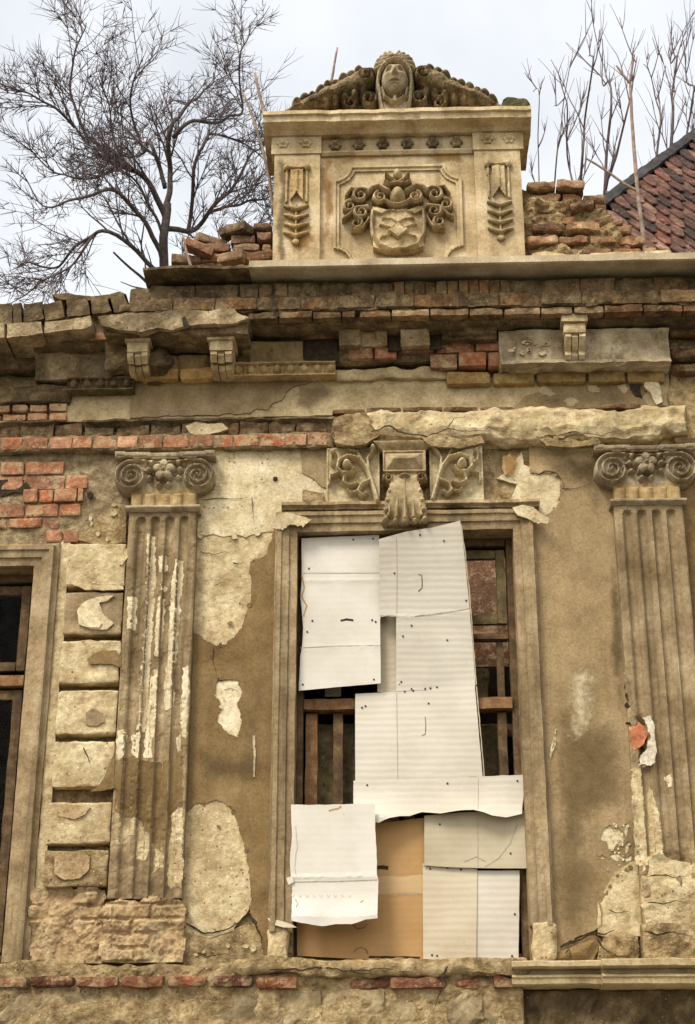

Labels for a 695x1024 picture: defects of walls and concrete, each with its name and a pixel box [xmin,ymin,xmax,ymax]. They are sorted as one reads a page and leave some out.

crack [373,417,509,437]
crack [544,430,620,439]
spalling [0,452,130,565]
spalling [73,382,695,966]
crack [648,874,689,905]
crack [560,930,690,959]